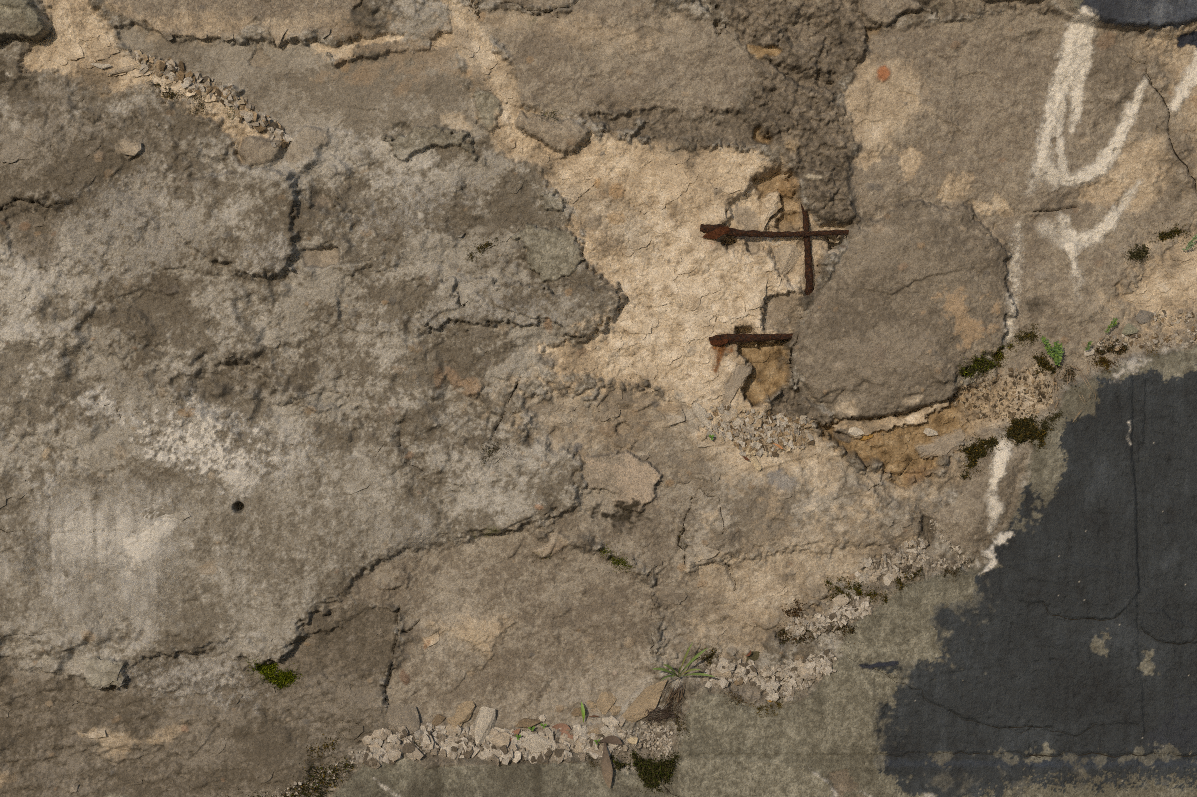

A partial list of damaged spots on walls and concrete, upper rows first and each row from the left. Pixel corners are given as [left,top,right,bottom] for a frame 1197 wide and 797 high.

crack [1128,56,1197,191]
corrosion [700,204,849,295]
spalling [442,0,1197,489]
spalling [0,0,673,797]
crack [677,491,736,590]
spalling [524,384,996,742]
crack [842,653,1197,760]
flaking render [673,758,840,797]